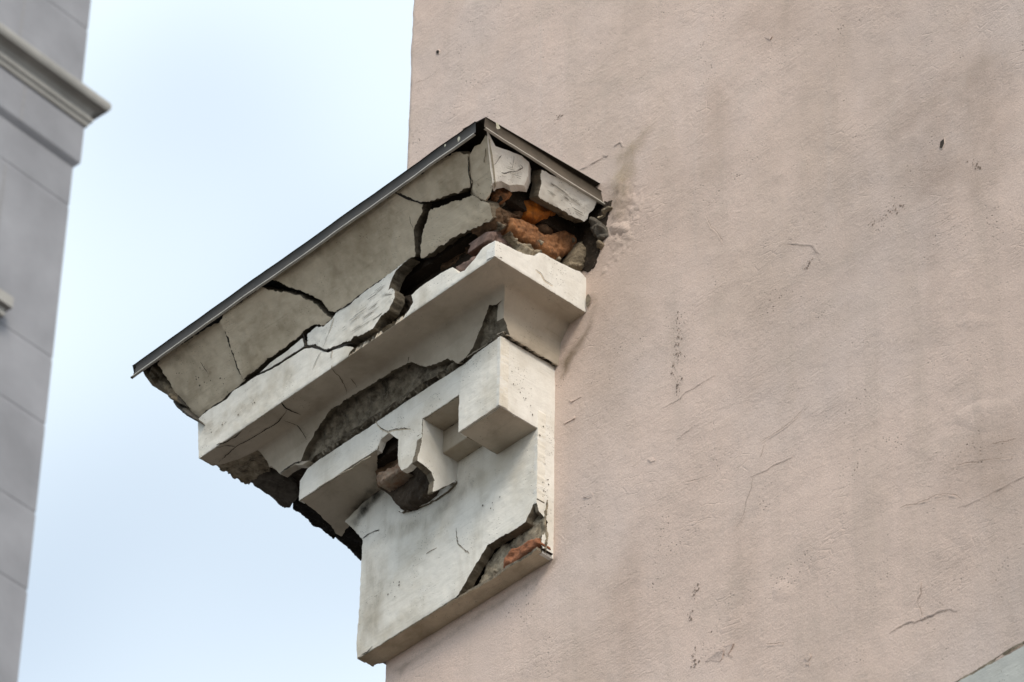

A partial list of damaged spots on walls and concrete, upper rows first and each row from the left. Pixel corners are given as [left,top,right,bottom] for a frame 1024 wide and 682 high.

crack [396,149,523,229]
spalling [432,167,613,275]
crack [225,267,398,395]
spalling [390,295,413,324]
spalling [474,305,506,355]
crack [217,402,307,473]
spalling [307,362,462,466]
crack [376,422,411,433]
spalling [214,450,363,561]
spalling [375,456,439,512]
spalling [478,479,553,585]